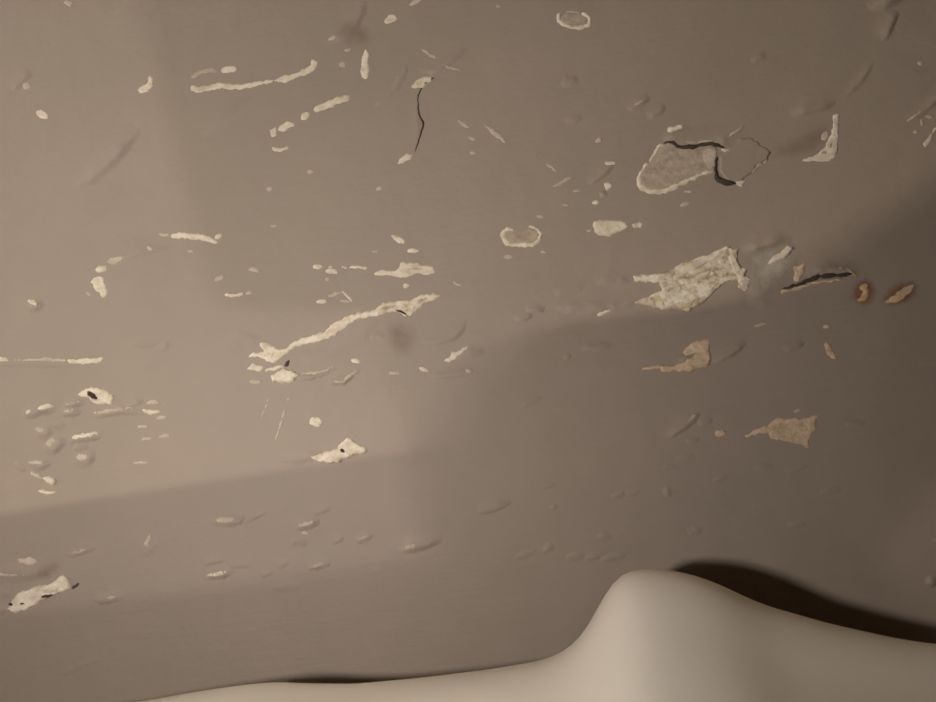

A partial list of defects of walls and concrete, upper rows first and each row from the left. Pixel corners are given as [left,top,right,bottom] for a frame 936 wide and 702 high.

crack [398,45,468,164]
peeling [637,116,771,207]
peeling [803,114,840,162]
peeling [313,235,435,288]
peeling [500,215,546,259]
peeling [633,246,751,312]
peeling [780,248,861,294]
peeling [222,292,440,385]
peeling [642,337,746,372]
peeling [279,438,367,466]
peeling [745,408,818,448]
peeling [0,552,79,615]